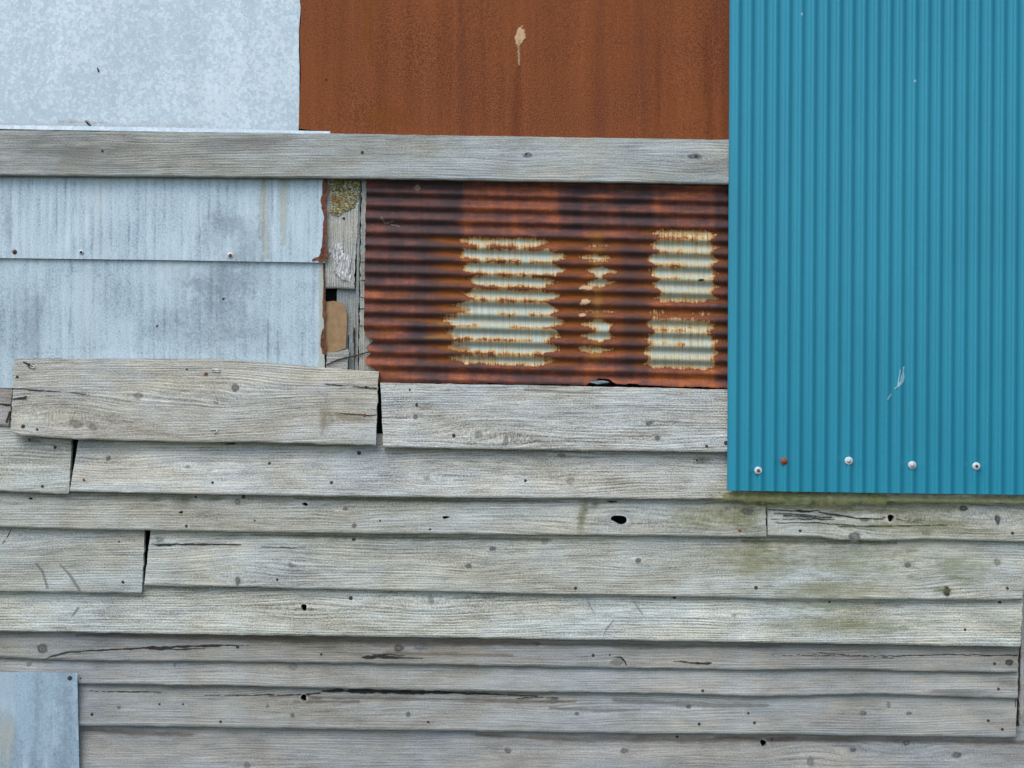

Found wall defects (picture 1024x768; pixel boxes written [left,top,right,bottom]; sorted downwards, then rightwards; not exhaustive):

rust [312,179,330,354]
rust [590,233,603,361]
rust [401,319,467,351]
water stain [723,491,1024,504]
crack [768,509,943,527]
crack [44,644,249,660]
crack [205,689,558,699]